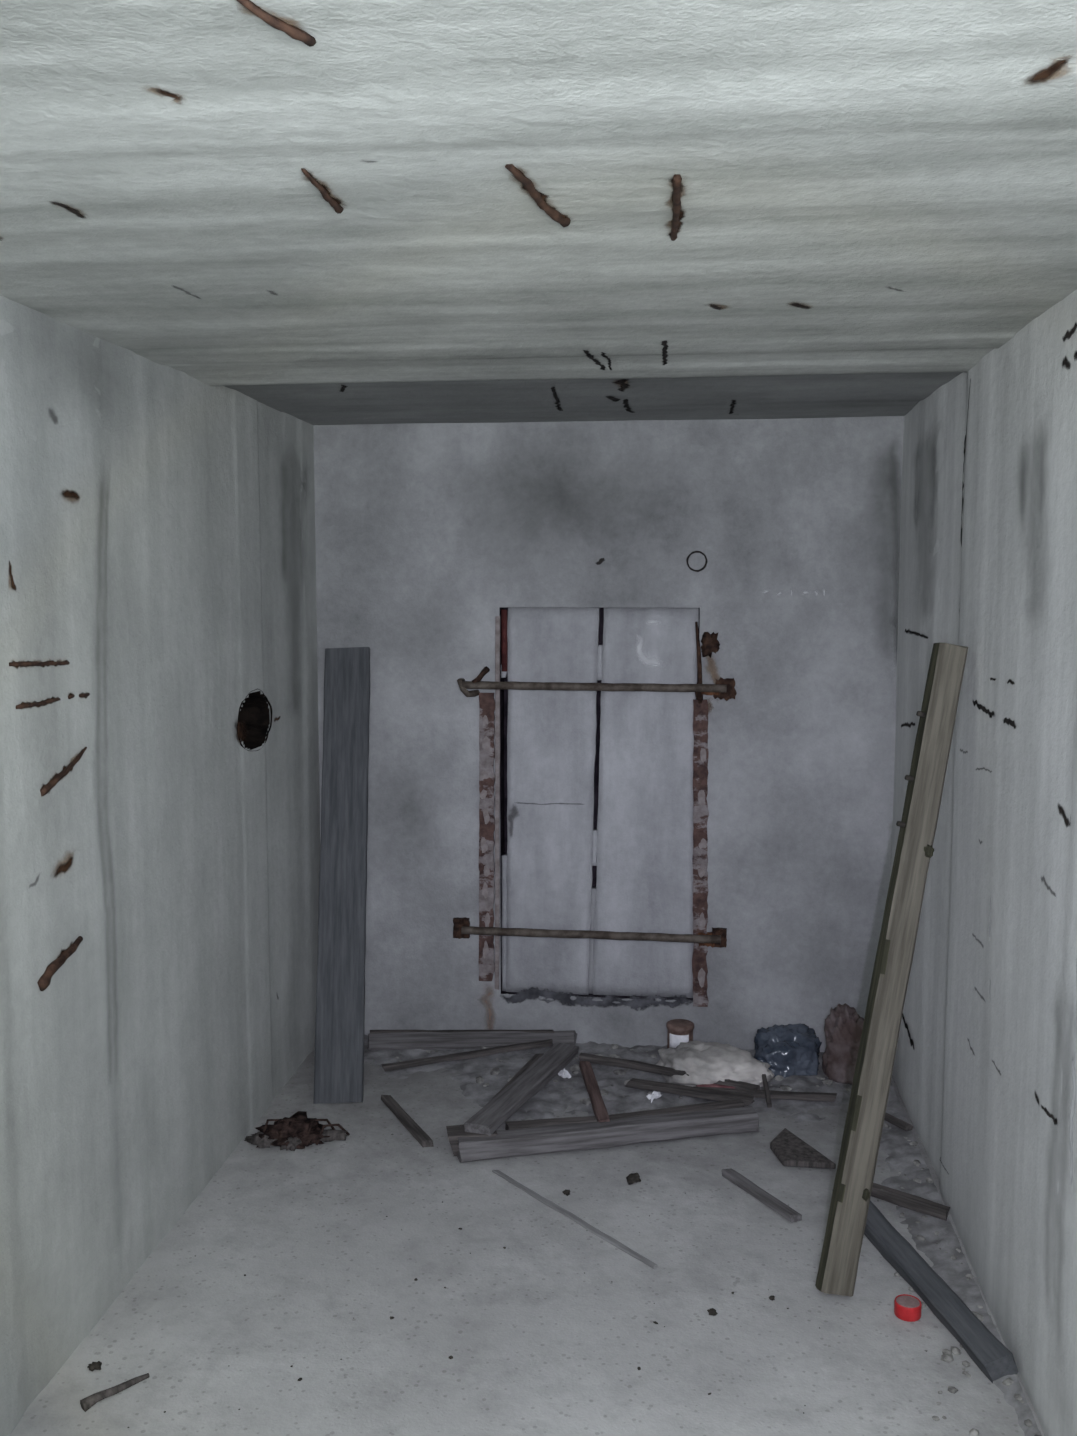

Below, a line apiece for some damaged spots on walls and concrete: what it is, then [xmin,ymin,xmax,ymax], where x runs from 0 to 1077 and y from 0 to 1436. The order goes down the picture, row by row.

rust [1029,59,1068,83]
hole [235,689,280,751]
rust [55,854,73,876]